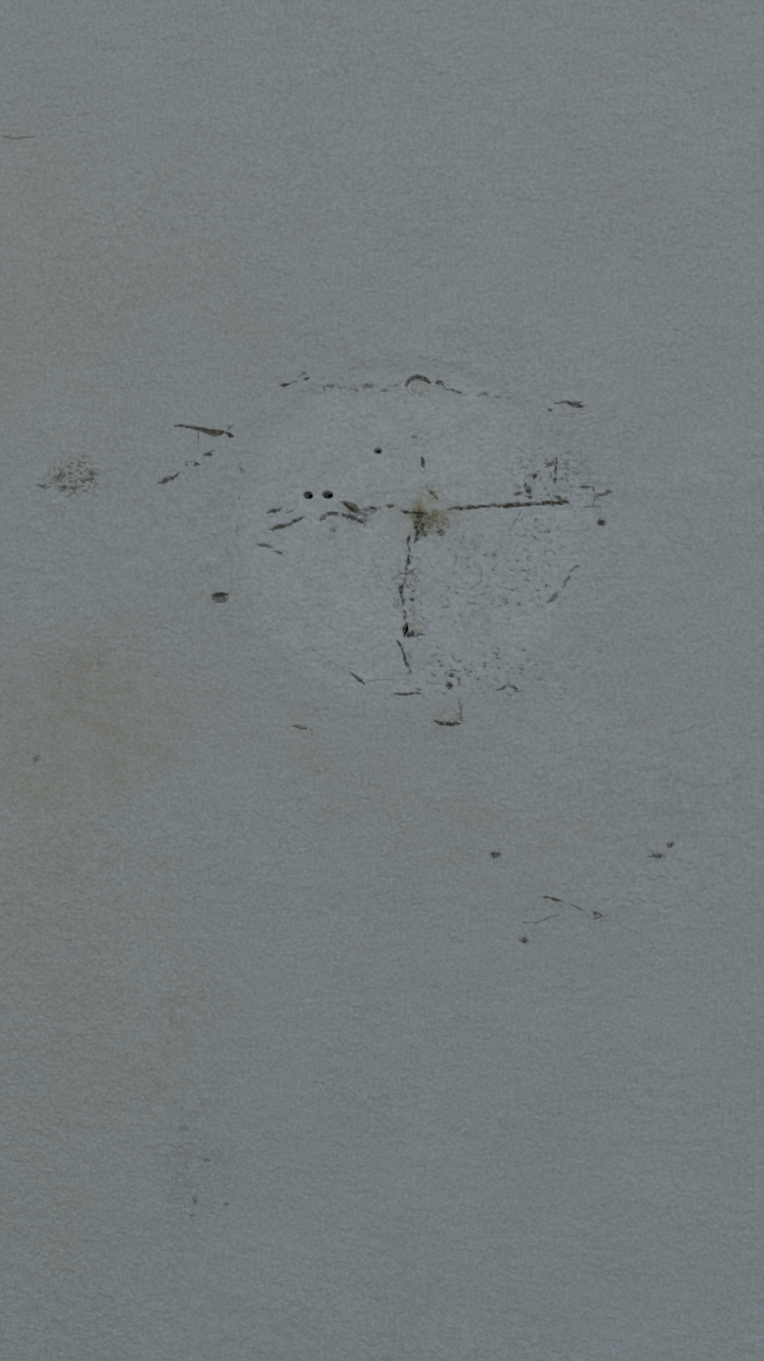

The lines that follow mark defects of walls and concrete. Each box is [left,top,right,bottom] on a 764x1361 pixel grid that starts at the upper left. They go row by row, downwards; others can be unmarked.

crack [421,457,602,510]
crack [264,501,394,554]
crack [393,548,419,696]